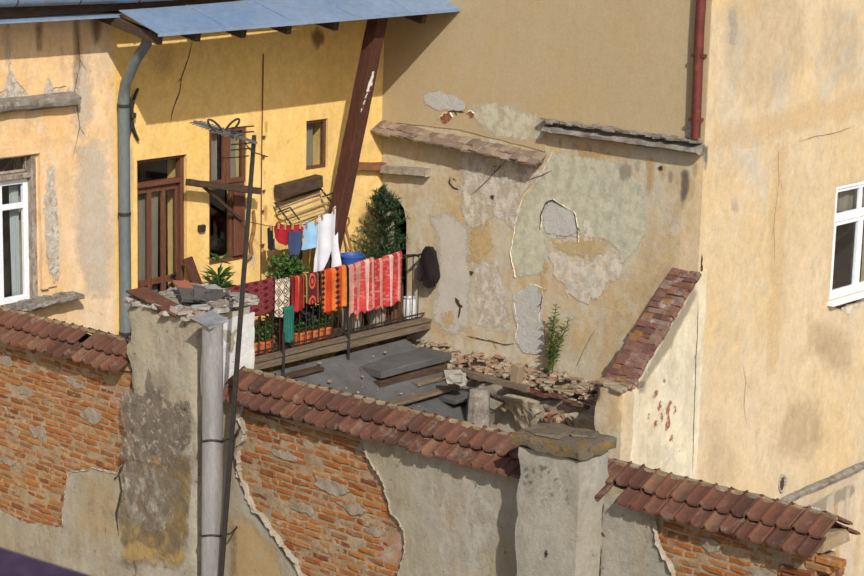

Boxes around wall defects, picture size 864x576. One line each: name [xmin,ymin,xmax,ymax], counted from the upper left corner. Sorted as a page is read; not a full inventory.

flaking render [0,60,29,98]
crack [72,30,86,161]
crack [169,44,192,127]
peeling [423,91,546,142]
flaking render [43,164,60,282]
peeling [429,151,646,355]
flaking render [0,341,182,532]
flaking render [235,406,406,576]
flaking render [648,391,676,442]
flaking render [648,514,847,576]